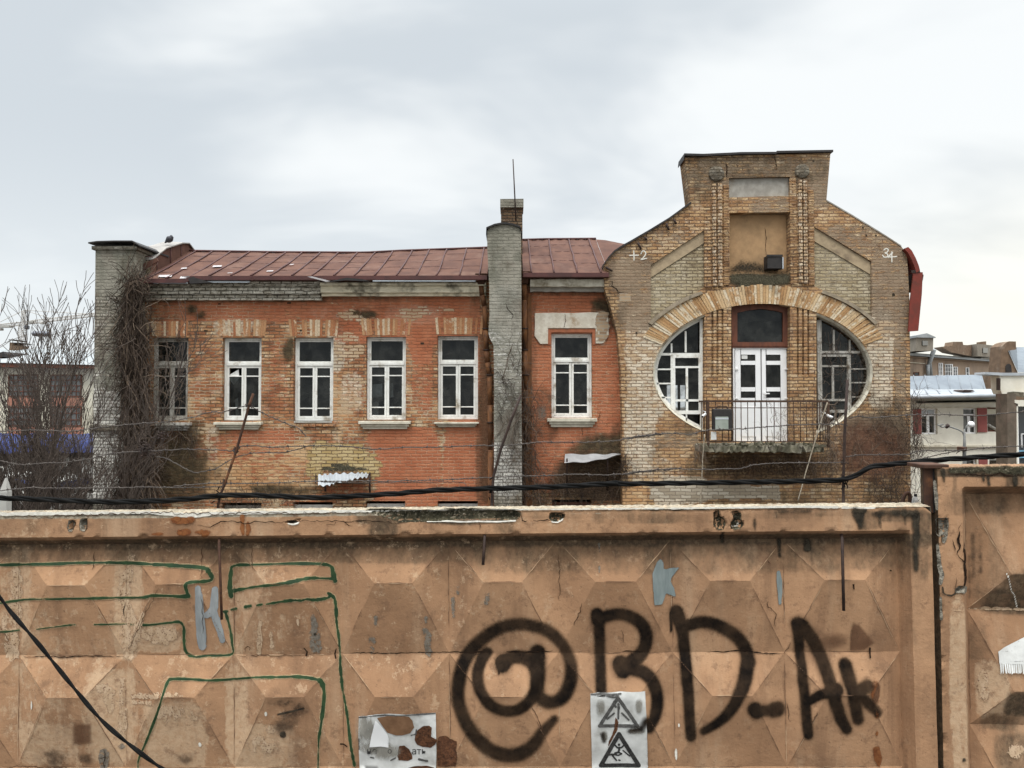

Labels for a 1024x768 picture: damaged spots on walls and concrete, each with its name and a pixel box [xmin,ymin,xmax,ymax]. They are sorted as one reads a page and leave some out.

crack [12,511,399,628]
spalling [549,513,565,523]
peeling [649,484,781,530]
leakage [852,507,920,571]
crack [953,523,967,612]